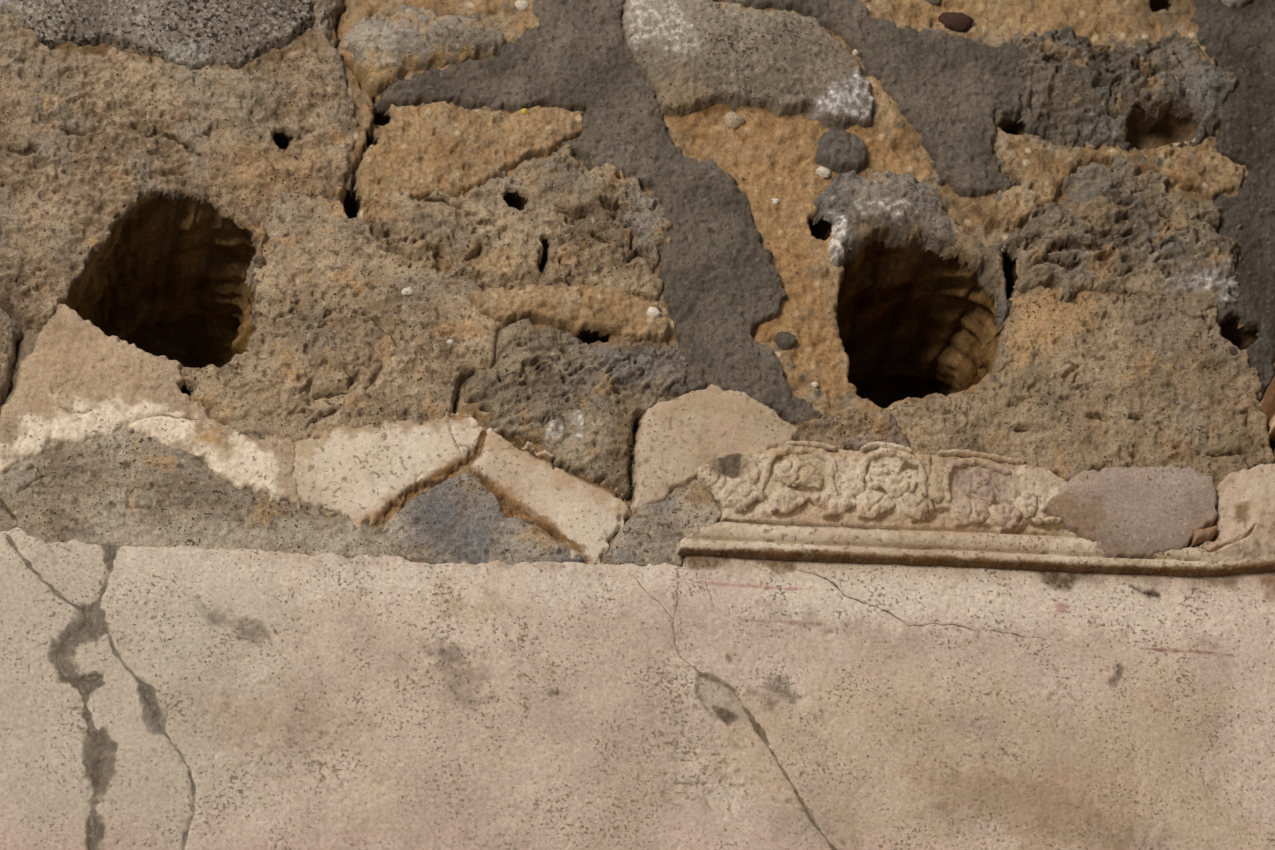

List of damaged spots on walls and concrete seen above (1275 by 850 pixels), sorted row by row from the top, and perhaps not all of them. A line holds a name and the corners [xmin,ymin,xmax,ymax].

spalling [312,370,381,423]
spalling [0,428,584,565]
spalling [602,479,721,567]
crack [0,476,196,850]
crack [637,567,715,679]
crack [817,574,1044,639]
crack [735,693,837,850]